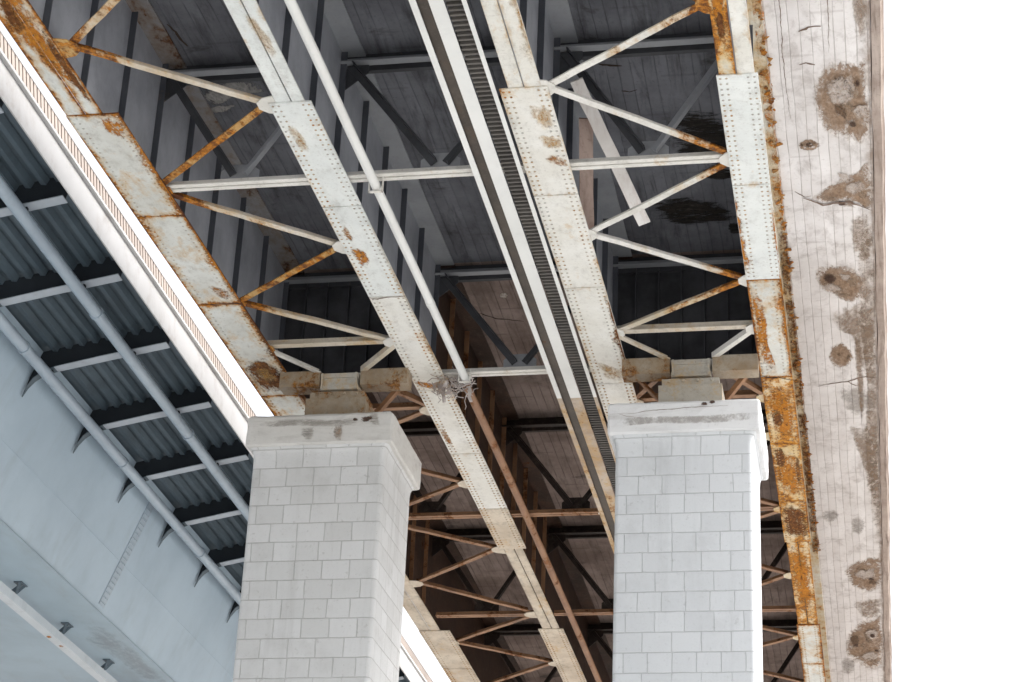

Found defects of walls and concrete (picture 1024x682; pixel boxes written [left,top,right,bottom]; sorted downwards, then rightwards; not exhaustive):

rust [0,0,91,102]
rust [711,0,727,51]
rust [343,229,369,266]
rust [735,202,750,266]
rust [752,0,821,605]
rust [245,312,286,391]
damp [838,270,879,517]